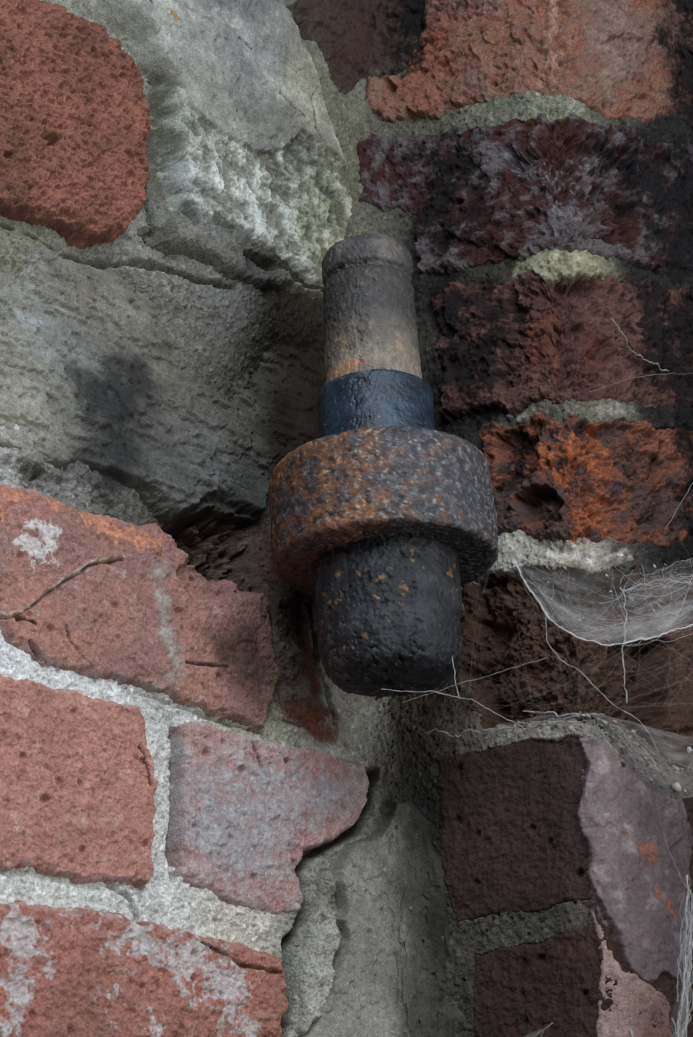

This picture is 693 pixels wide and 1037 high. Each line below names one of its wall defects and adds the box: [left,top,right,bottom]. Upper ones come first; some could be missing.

corrosion [290,644,337,741]
crack [295,828,350,869]
efflorescence [0,911,52,1004]
efflorescence [100,915,257,1037]